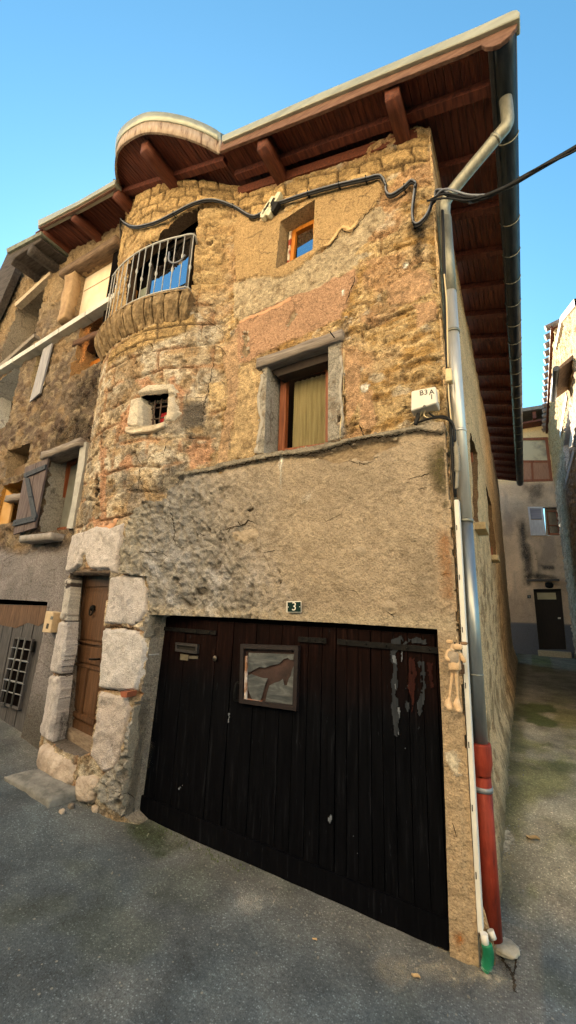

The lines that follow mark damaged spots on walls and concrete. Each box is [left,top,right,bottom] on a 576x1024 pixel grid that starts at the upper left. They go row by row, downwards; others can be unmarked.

flaking render [324,220,359,247]
water stain [430,447,446,506]
crack [139,505,254,556]
peeling [390,636,434,737]